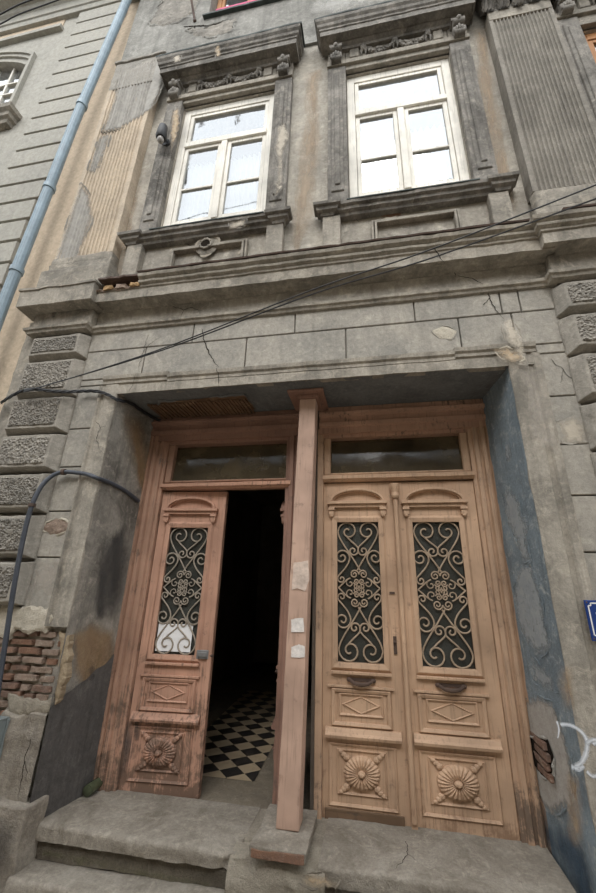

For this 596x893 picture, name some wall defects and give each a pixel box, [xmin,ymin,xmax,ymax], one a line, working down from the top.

peeling [86,60,163,171]
peeling [57,182,94,260]
peeling [103,282,140,291]
crack [173,306,219,384]
spalling [0,519,25,551]
spalling [43,517,69,536]
spalling [0,566,74,715]
peeling [502,492,575,817]